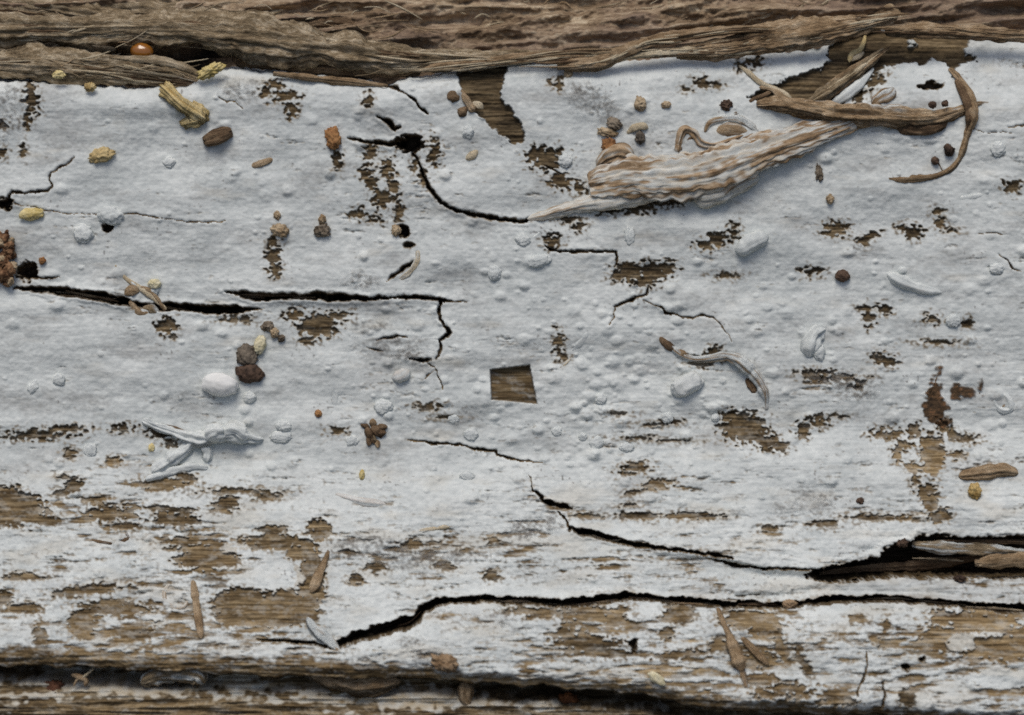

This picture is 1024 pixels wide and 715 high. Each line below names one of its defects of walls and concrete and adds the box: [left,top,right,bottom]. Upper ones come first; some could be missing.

peeling [346,137,443,228]
crack [347,85,529,224]
peeling [456,66,589,196]
crack [545,245,618,266]
crack [13,261,464,390]
crack [609,284,732,342]
crack [407,439,814,571]
peeling [715,407,850,455]
peeling [805,419,981,528]
peeling [0,473,340,651]
crack [257,591,1024,650]
peeling [502,605,862,708]